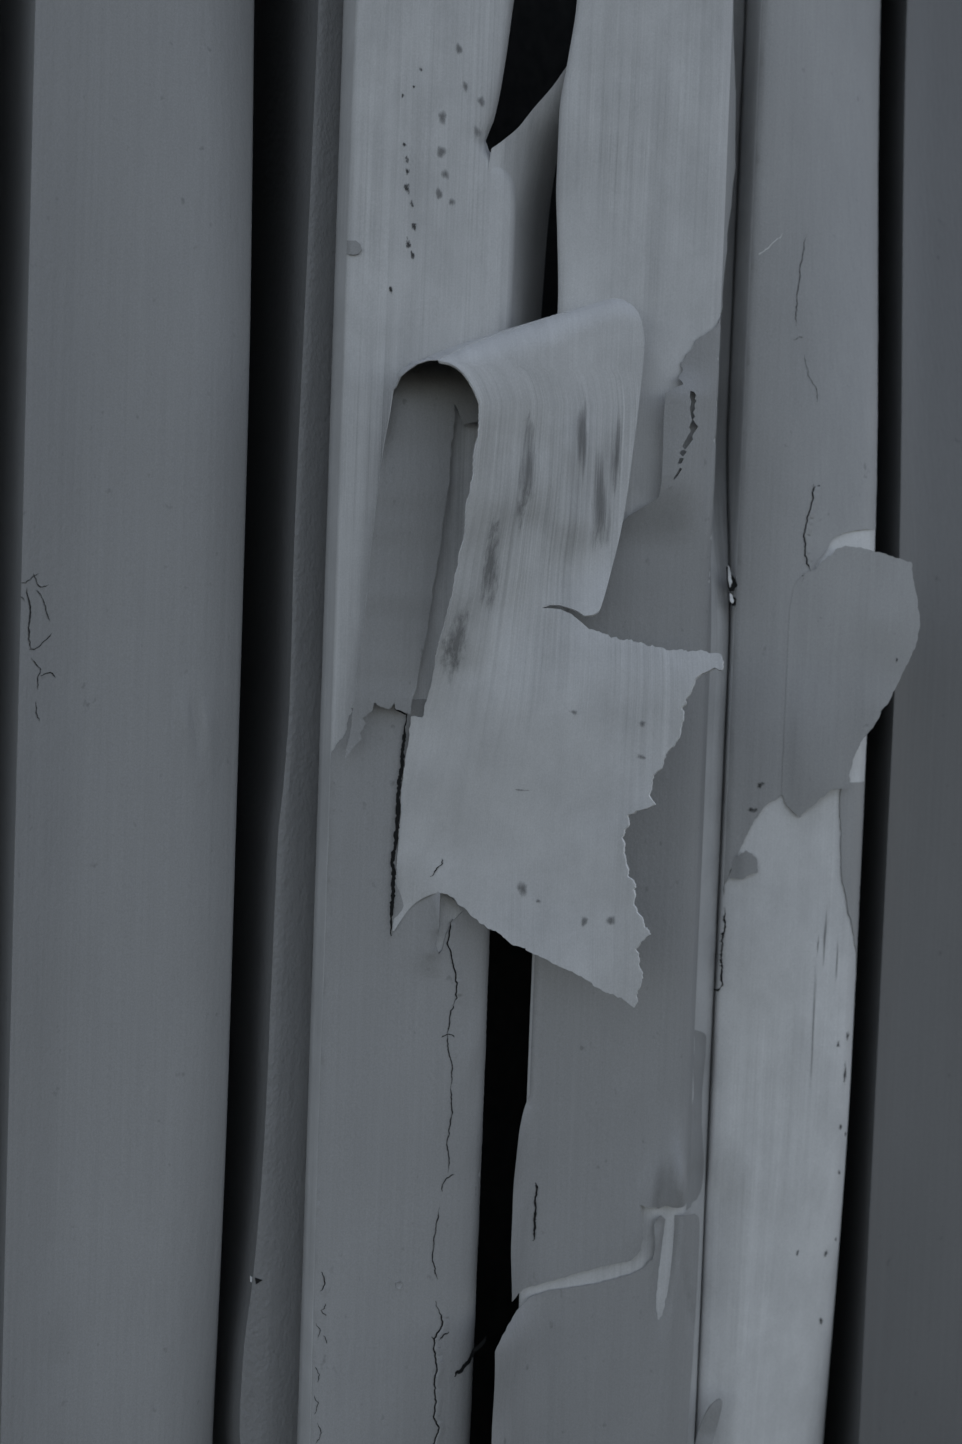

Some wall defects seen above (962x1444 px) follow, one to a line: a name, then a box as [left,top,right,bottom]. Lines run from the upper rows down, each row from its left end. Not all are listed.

peeling [345,14,737,1444]
peeling [782,546,920,982]
crack [432,919,487,1444]